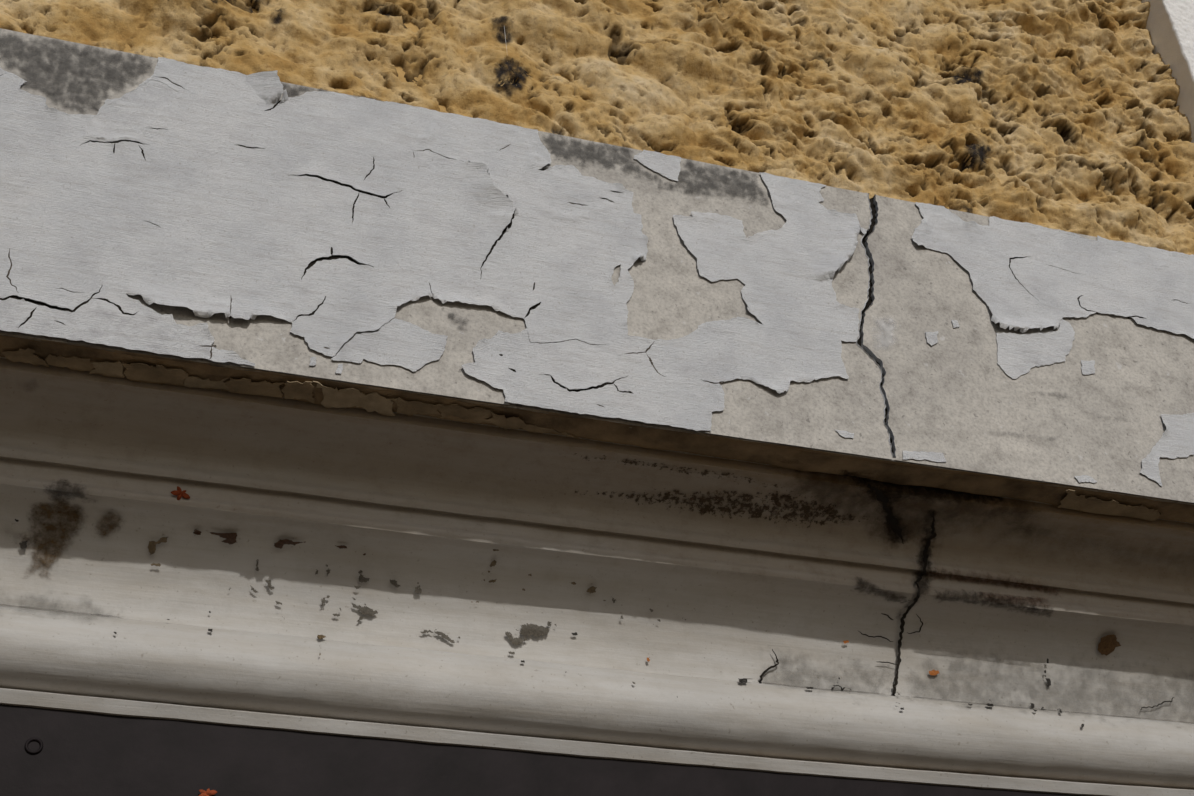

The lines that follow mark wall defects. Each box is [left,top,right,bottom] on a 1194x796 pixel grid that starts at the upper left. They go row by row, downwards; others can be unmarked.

peeling [0,28,179,143]
peeling [245,70,359,103]
crack [295,157,401,222]
crack [0,248,137,328]
crack [294,296,326,321]
crack [301,247,373,279]
peeling [538,131,1194,521]
peeling [1,294,587,442]
crack [856,193,998,696]
water stain [575,459,865,528]
peeling [193,529,237,544]
water stain [936,592,1051,616]